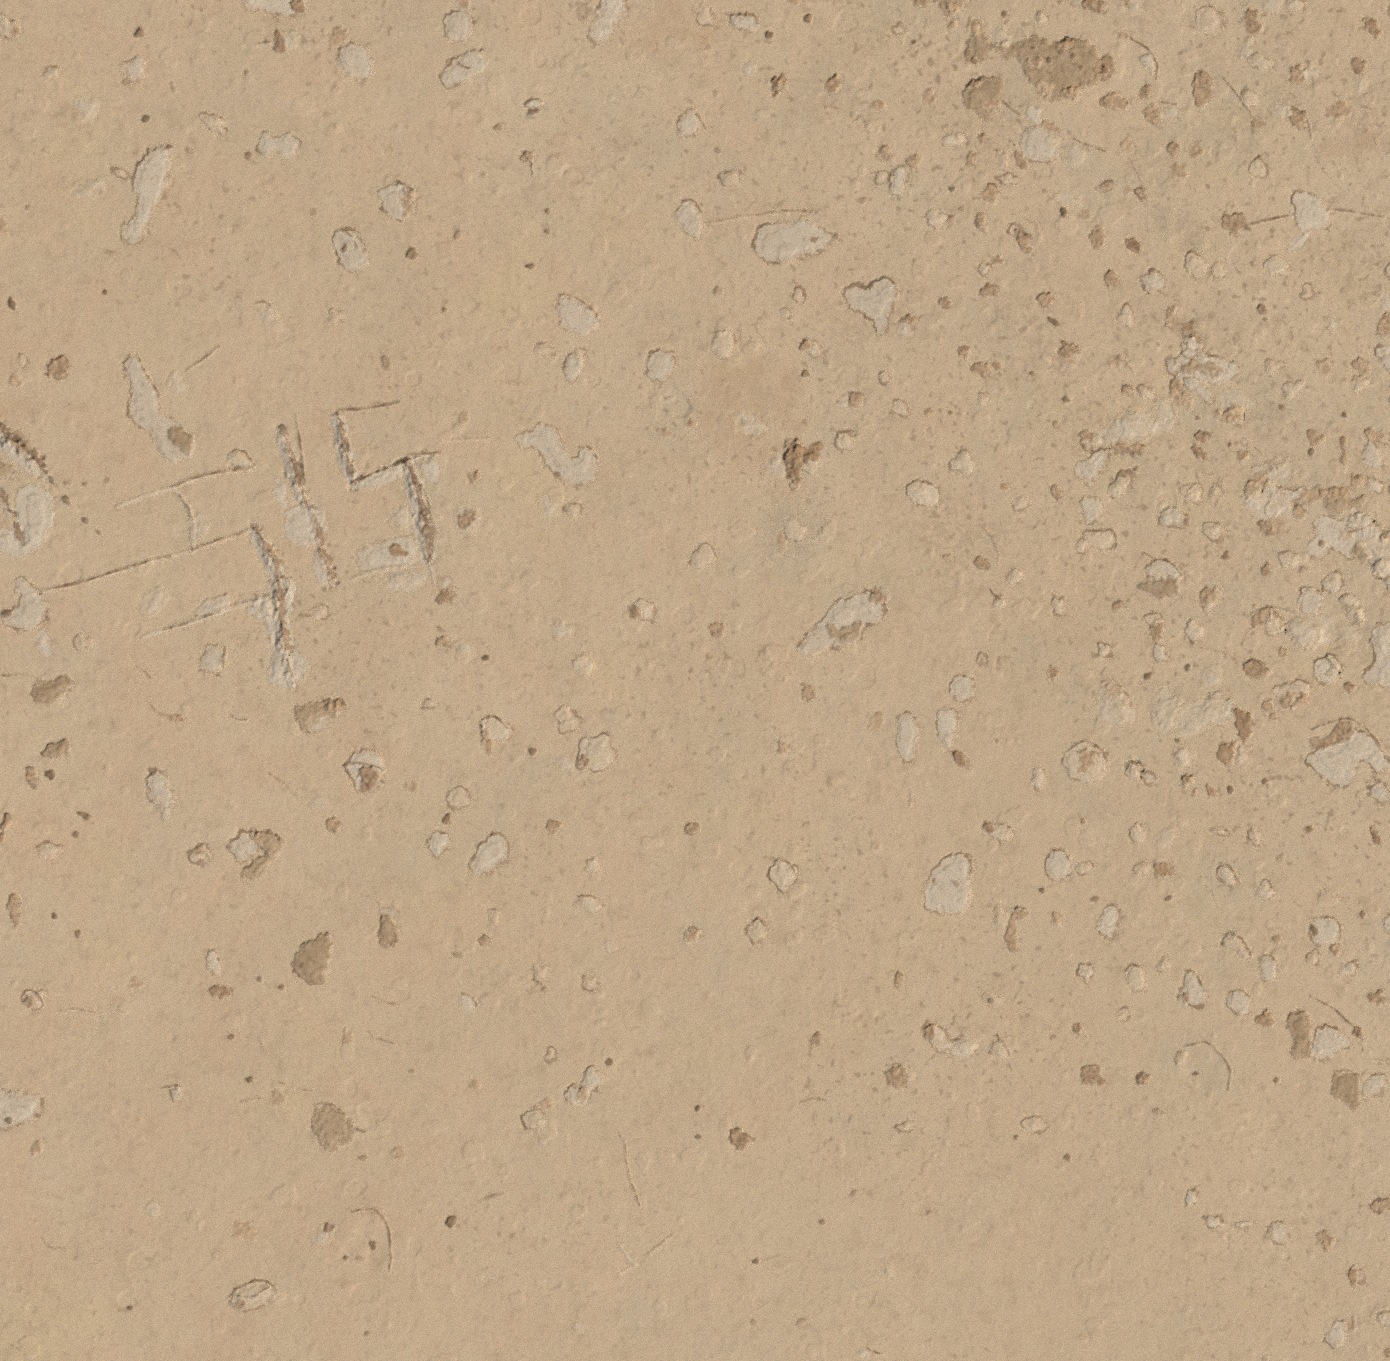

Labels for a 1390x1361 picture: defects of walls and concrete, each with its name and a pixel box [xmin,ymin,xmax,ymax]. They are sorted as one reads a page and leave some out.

spalling [913,0,1162,171]
spalling [1191,69,1214,109]
peeling [120,141,174,245]
peeling [750,210,839,265]
spalling [1125,237,1143,254]
peeling [841,276,919,335]
peeling [1050,305,1254,525]
peeling [1135,552,1183,601]
peeling [796,586,891,658]
peeling [1171,586,1390,807]
spalling [290,931,334,986]
spalling [310,1102,367,1153]